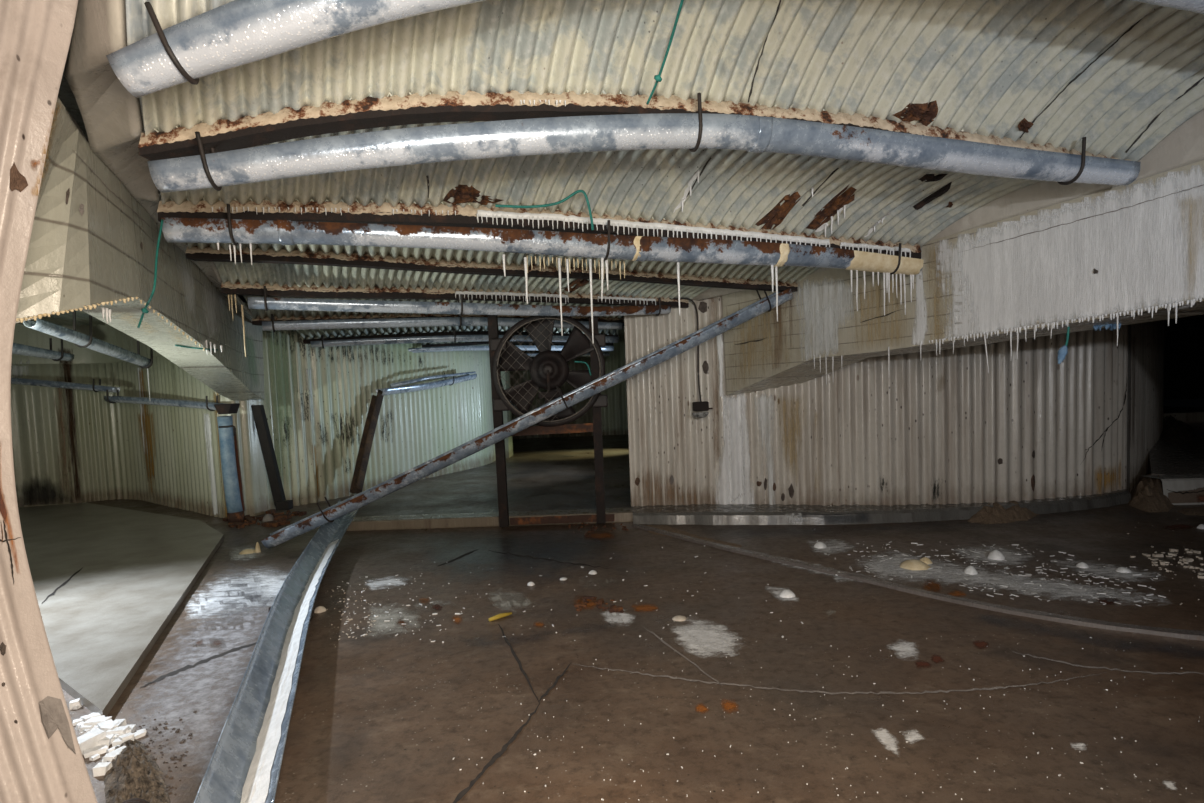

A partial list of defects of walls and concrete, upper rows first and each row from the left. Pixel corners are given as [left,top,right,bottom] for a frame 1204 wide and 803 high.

corrosion [893,100,938,126]
leakage [455,291,569,304]
corrosion [561,279,590,293]
corrosion [755,192,801,230]
corrosion [806,185,857,230]
leakage [477,163,1204,364]
leakage [22,388,71,505]
leakage [138,368,155,493]
leakage [204,392,227,517]
leakage [643,334,865,533]
corrosion [0,488,17,581]
crack [453,624,1204,803]